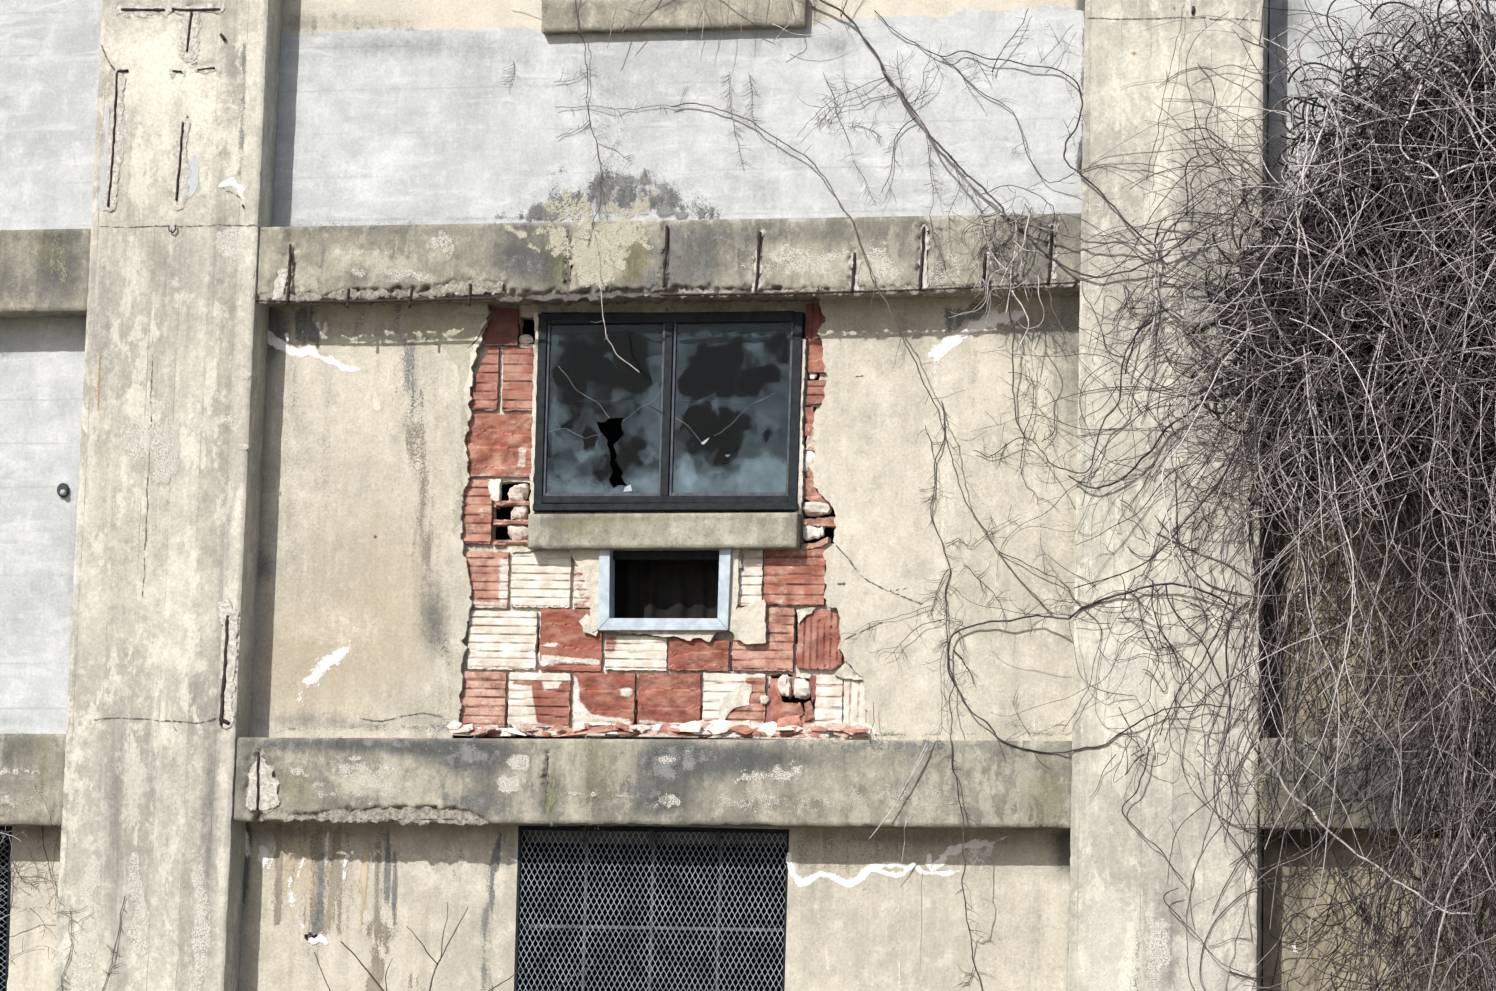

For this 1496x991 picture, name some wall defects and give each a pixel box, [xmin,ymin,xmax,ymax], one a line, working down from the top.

damp [270,33,733,291]
spalling [212,214,1092,534]
crack [142,355,153,597]
damp [243,304,511,991]
flaking render [512,546,599,636]
flaking render [617,549,767,645]
flaking render [796,607,817,623]
crack [95,717,218,731]
flaking render [657,682,752,764]
peeling [757,715,811,736]
spalling [245,752,488,826]
damp [620,730,966,821]